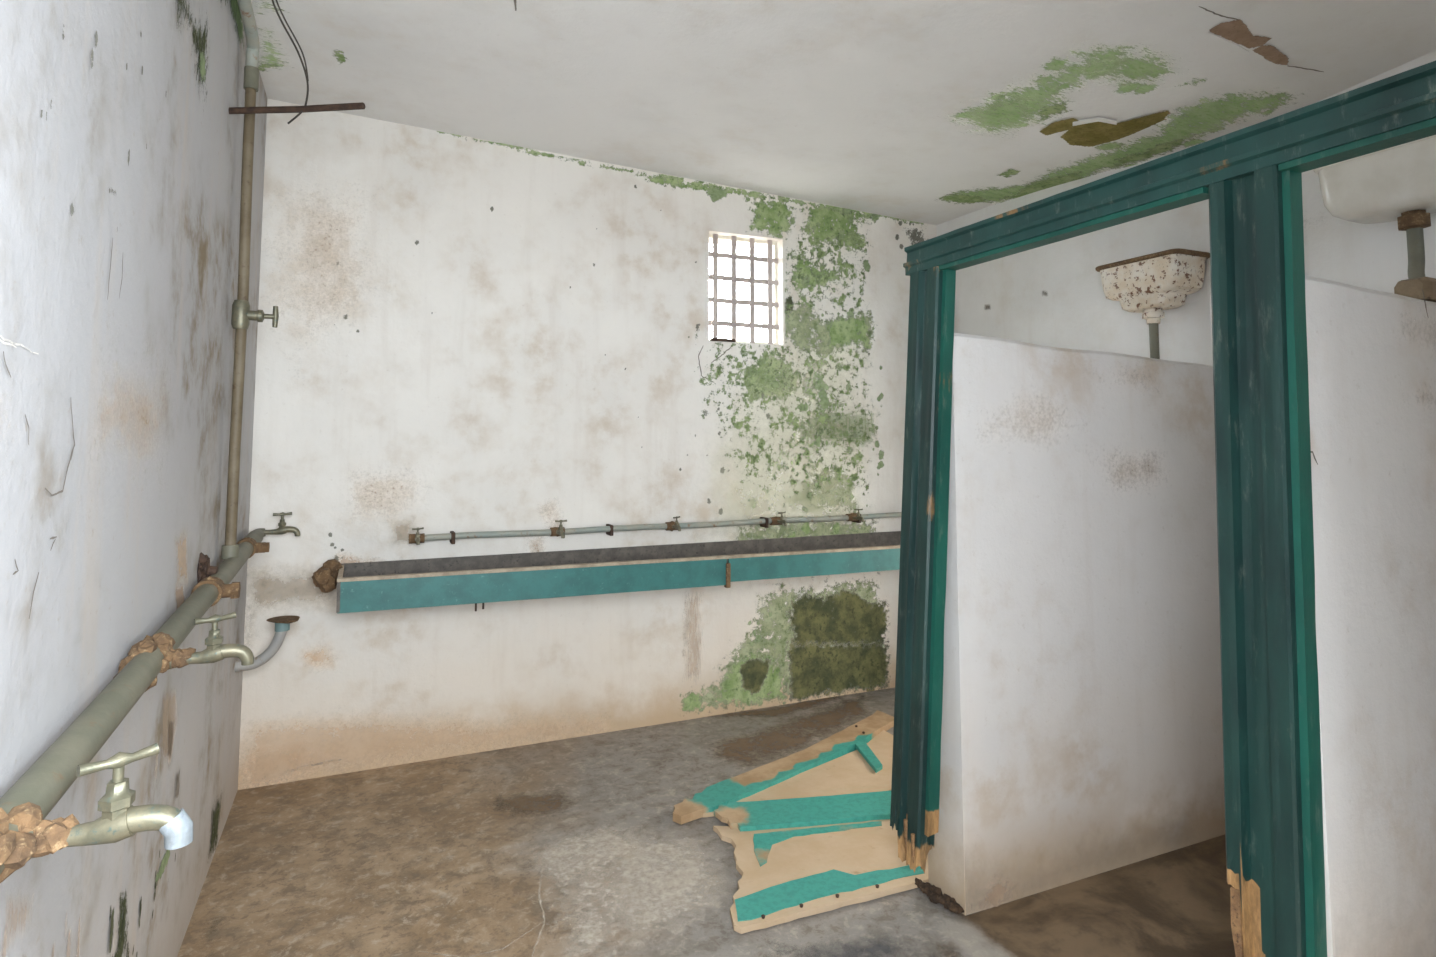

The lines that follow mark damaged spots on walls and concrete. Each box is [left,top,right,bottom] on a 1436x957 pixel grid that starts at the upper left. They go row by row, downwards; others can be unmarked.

flaking render [1207,19,1289,65]
mould [940,47,1292,204]
leakage [437,131,924,540]
leakage [680,573,890,766]
leakage [805,938,897,957]